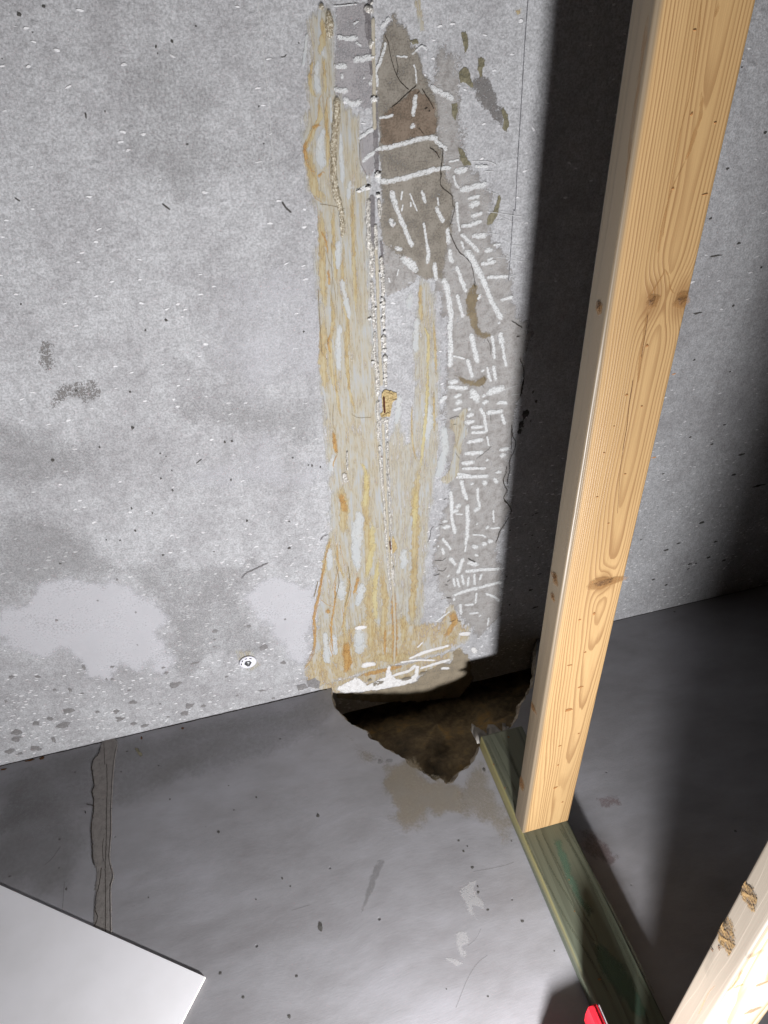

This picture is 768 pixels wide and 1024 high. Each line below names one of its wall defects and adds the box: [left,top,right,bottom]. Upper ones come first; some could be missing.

crack [385,36,476,287]
corrosion [301,9,470,693]
spalling [380,390,397,417]
spalling [517,390,538,434]
crack [457,415,516,541]
damp [0,576,175,681]
damp [245,577,321,663]
crack [0,689,327,933]